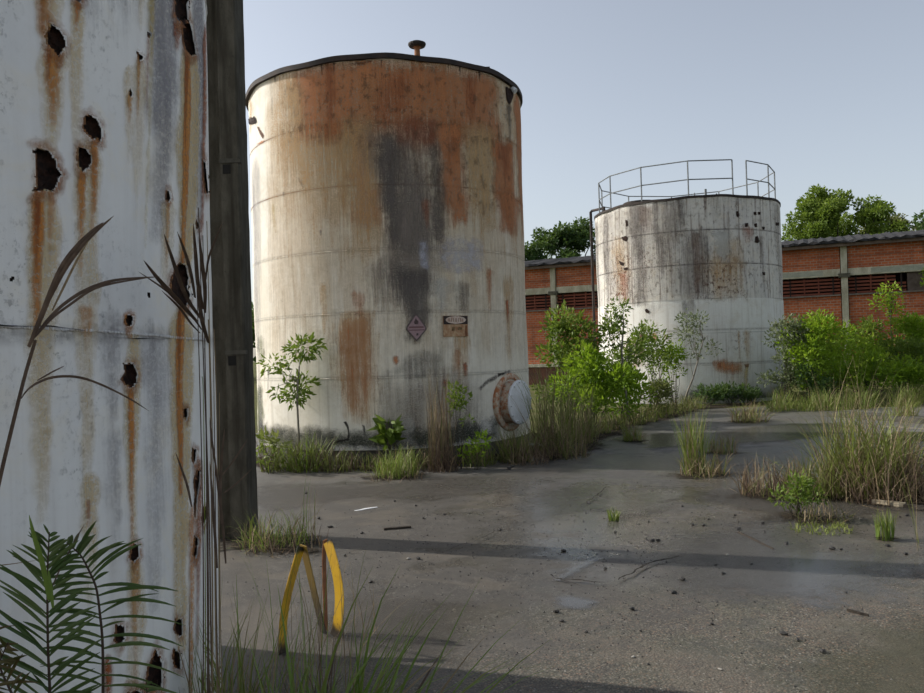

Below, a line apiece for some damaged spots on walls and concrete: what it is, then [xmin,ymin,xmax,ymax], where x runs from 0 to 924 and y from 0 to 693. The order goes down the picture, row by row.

corrosion [30,143,66,407]
corrosion [41,0,87,133]
corrosion [77,113,104,271]
corrosion [123,314,140,491]
corrosion [128,0,210,693]
corrosion [257,75,308,172]
corrosion [339,316,371,414]
damp [372,137,443,324]
corrosion [367,80,523,252]